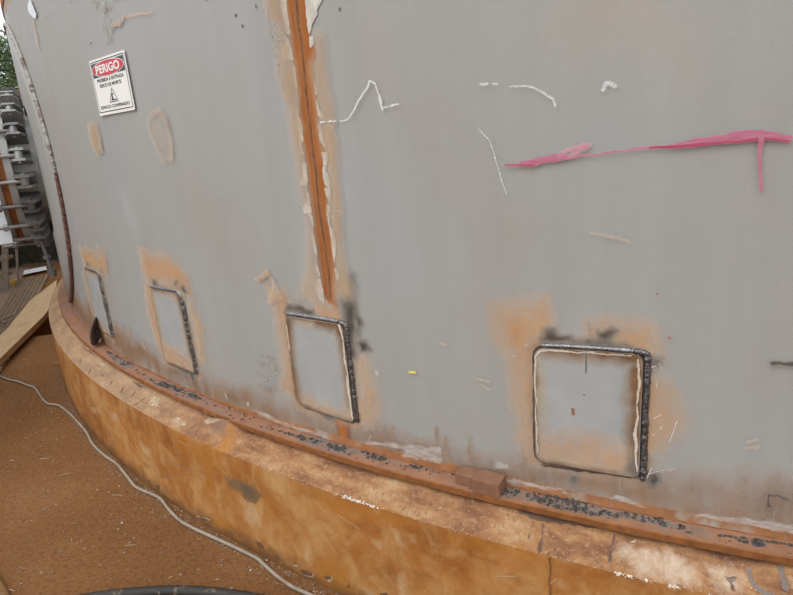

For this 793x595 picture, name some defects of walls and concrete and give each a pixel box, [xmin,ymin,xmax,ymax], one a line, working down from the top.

peeling [280,0,297,88]
peeling [305,0,322,48]
corrosion [267,0,349,311]
peeling [297,110,325,306]
peeling [314,82,339,281]